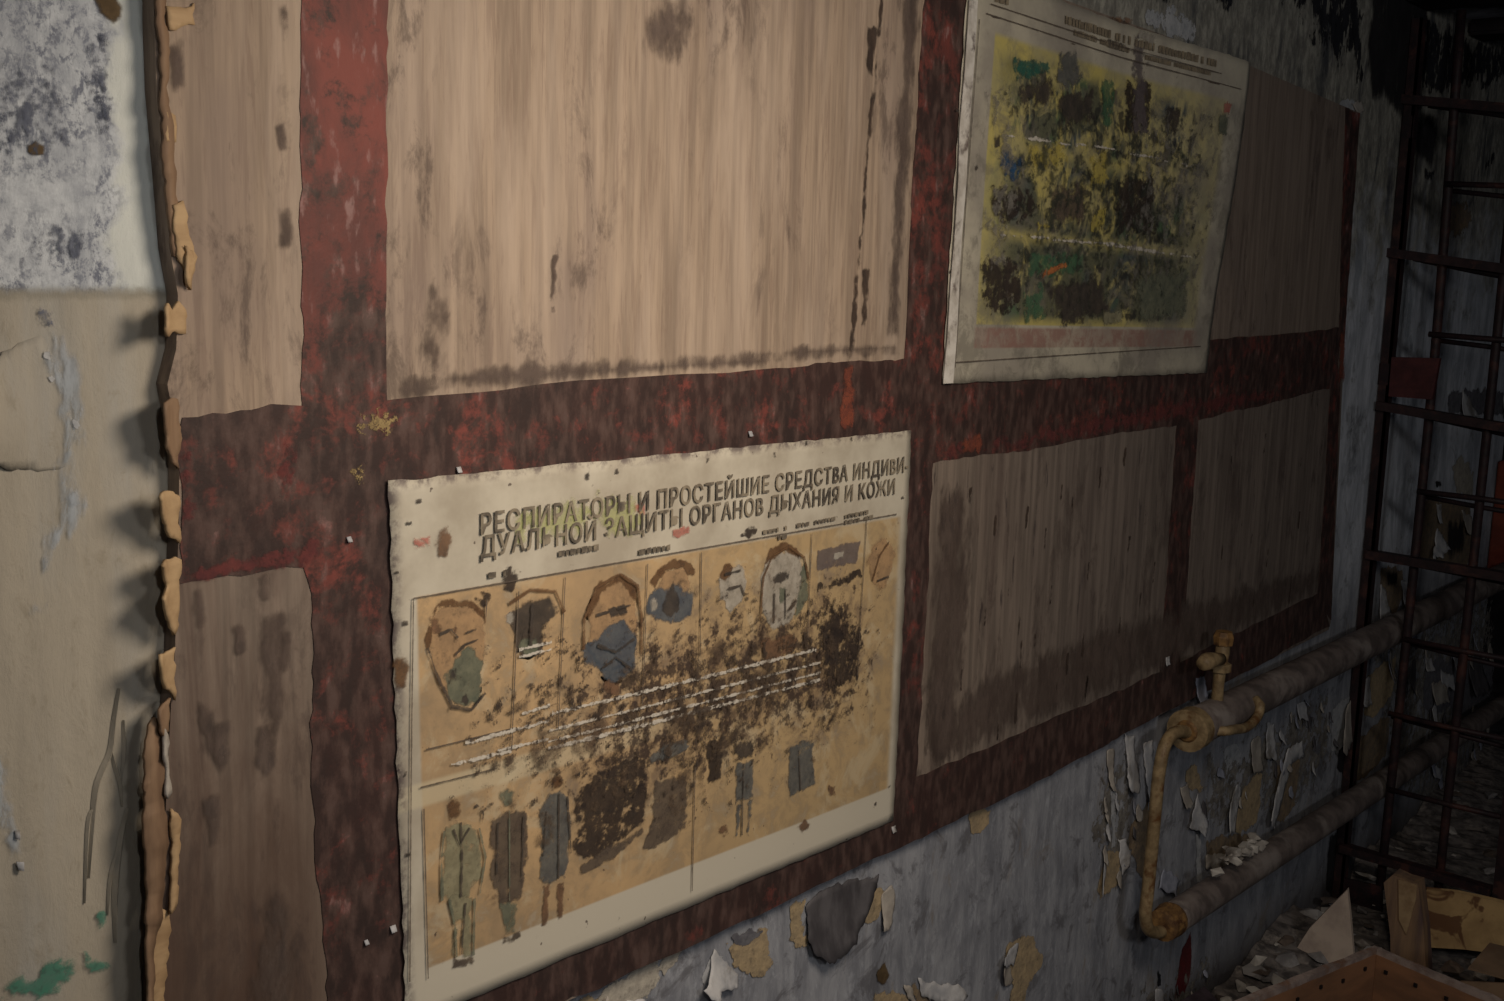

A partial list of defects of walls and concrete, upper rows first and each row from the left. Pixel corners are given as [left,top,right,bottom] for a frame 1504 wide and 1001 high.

leakage [0,65,65,155]
leakage [88,0,122,140]
leakage [1282,0,1364,84]
leakage [22,225,94,262]
peeling [0,335,76,472]
peeling [1091,655,1396,899]
peeling [579,951,682,1001]
peeling [701,927,773,1001]
peeling [789,874,895,964]
peeling [873,963,968,1001]
peeling [1004,936,1043,1001]
spalling [1297,832,1355,963]